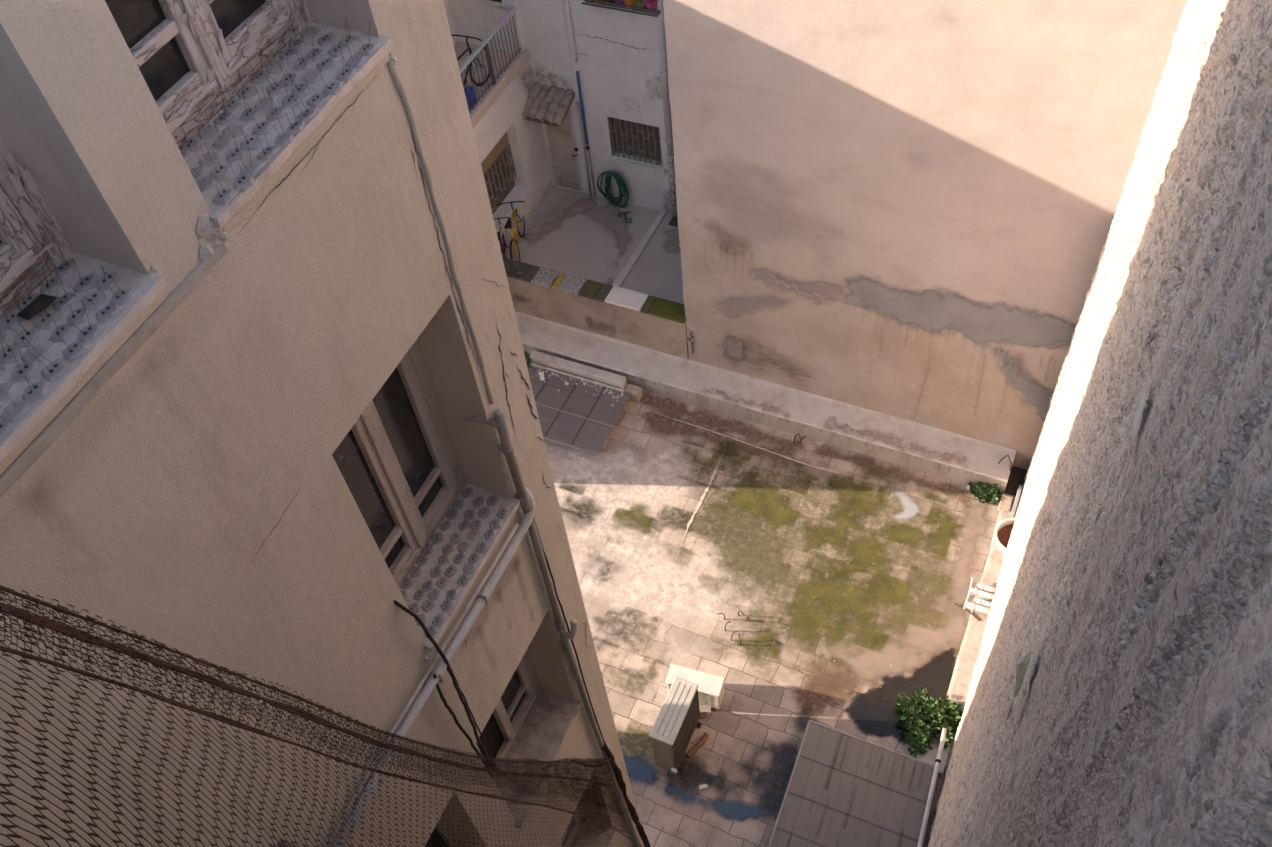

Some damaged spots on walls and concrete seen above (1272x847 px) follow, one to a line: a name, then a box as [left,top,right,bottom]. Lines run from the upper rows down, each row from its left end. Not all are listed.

crack [578,34,657,51]
crack [403,104,543,441]
water stain [717,269,841,318]
crack [244,485,302,571]